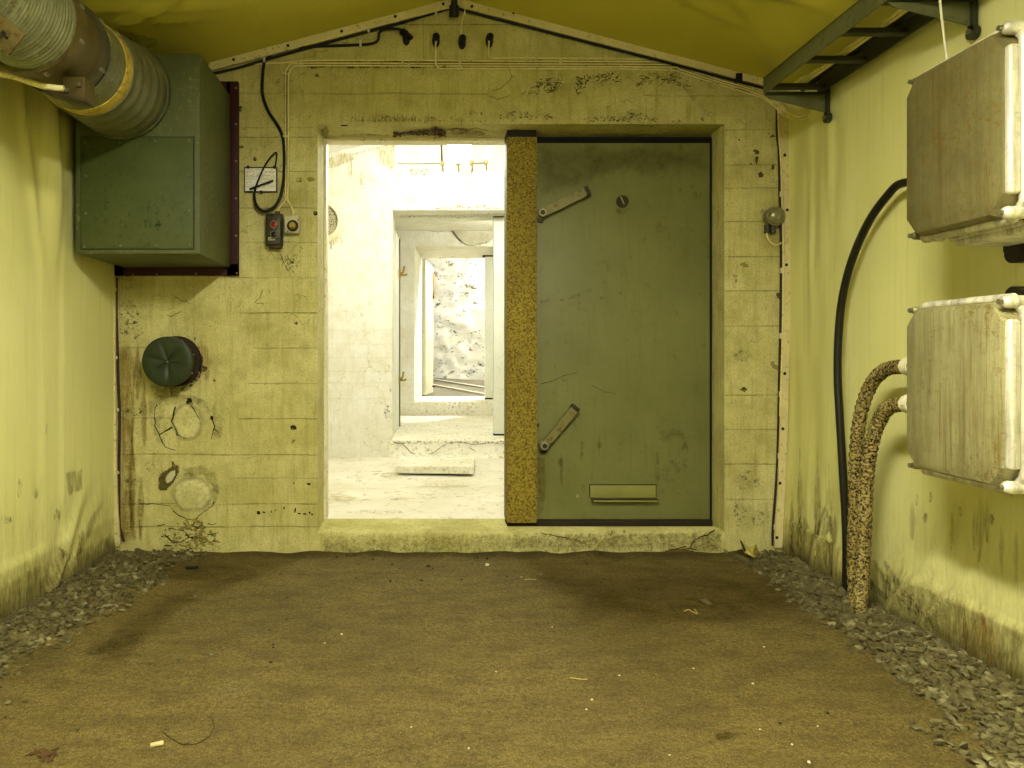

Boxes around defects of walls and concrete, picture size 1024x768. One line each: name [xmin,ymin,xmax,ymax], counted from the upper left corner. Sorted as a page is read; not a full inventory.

damp [120,355,146,536]
crack [154,404,219,451]
spalling [158,461,180,490]
crack [140,503,212,543]
crack [674,530,714,551]